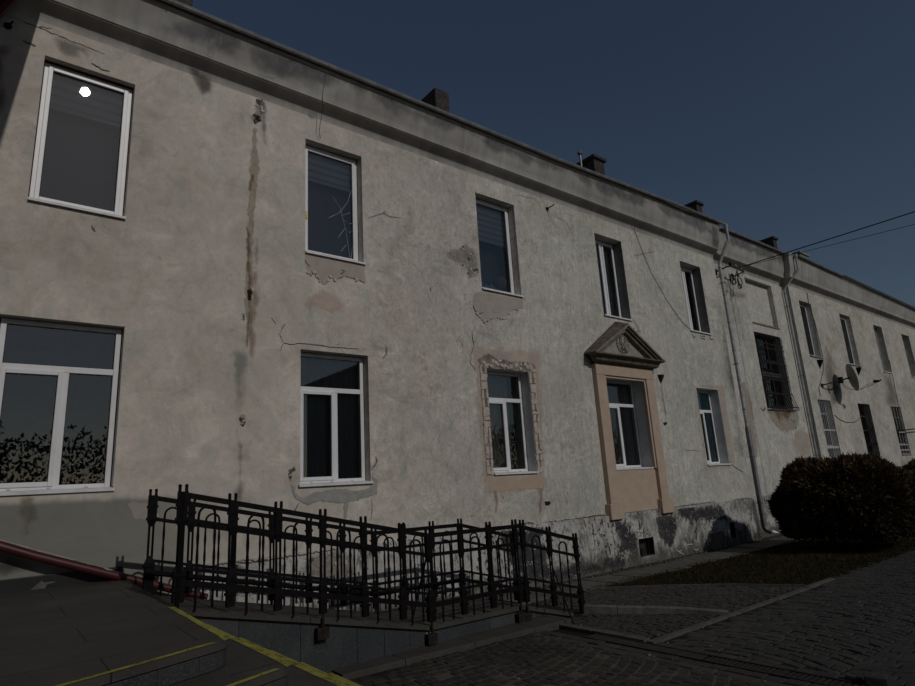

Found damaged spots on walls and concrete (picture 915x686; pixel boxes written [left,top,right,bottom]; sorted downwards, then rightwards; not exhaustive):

crack [7,15,110,72]
peeling [306,255,366,285]
spalling [447,244,480,277]
crack [271,317,359,351]
water stain [656,503,728,551]